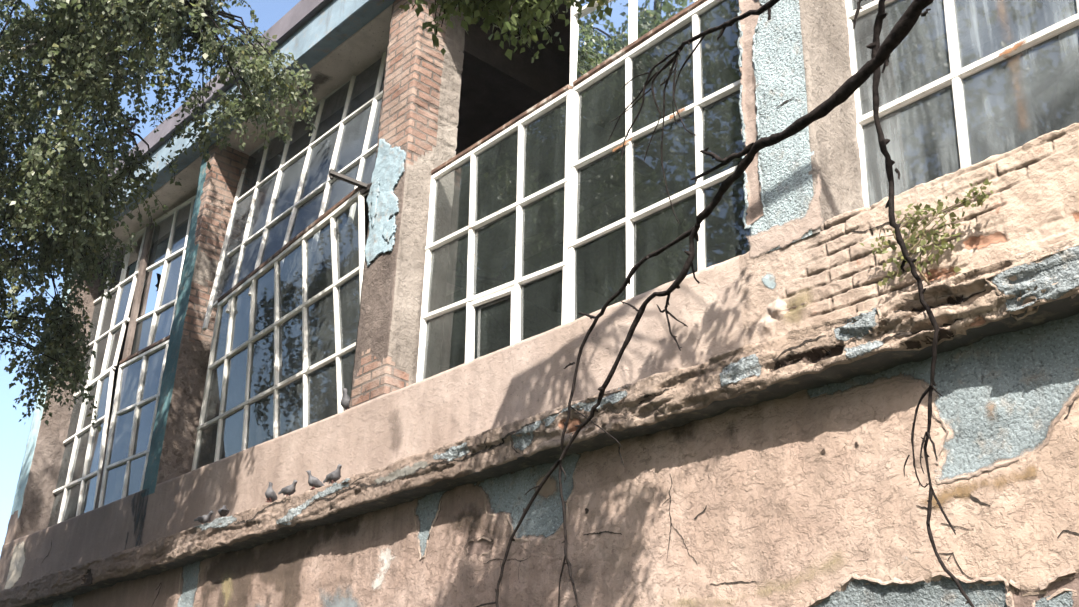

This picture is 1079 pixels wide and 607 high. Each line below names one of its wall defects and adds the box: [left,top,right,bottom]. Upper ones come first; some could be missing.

flaking render [737,0,766,229]
peeling [364,139,406,266]
flaking render [963,232,1007,249]
flaking render [807,243,1079,484]
peeling [511,388,629,450]
leakage [203,517,359,607]
flaking render [413,491,447,560]
flaking render [474,453,581,544]
flaking render [758,565,1079,607]
crack [916,494,991,579]